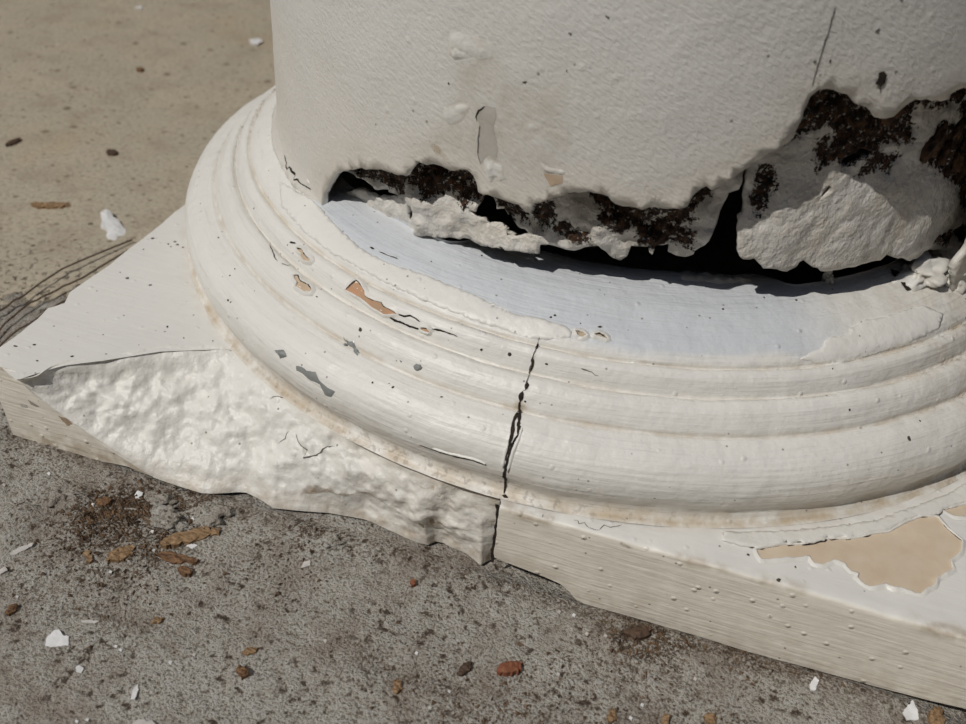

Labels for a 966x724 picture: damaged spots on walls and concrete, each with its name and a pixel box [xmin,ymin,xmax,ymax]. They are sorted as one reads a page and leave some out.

peeling [475,106,506,184]
spalling [875,71,887,94]
peeling [279,182,612,343]
spalling [19,344,500,565]
crack [420,339,539,563]
peeling [752,502,966,598]